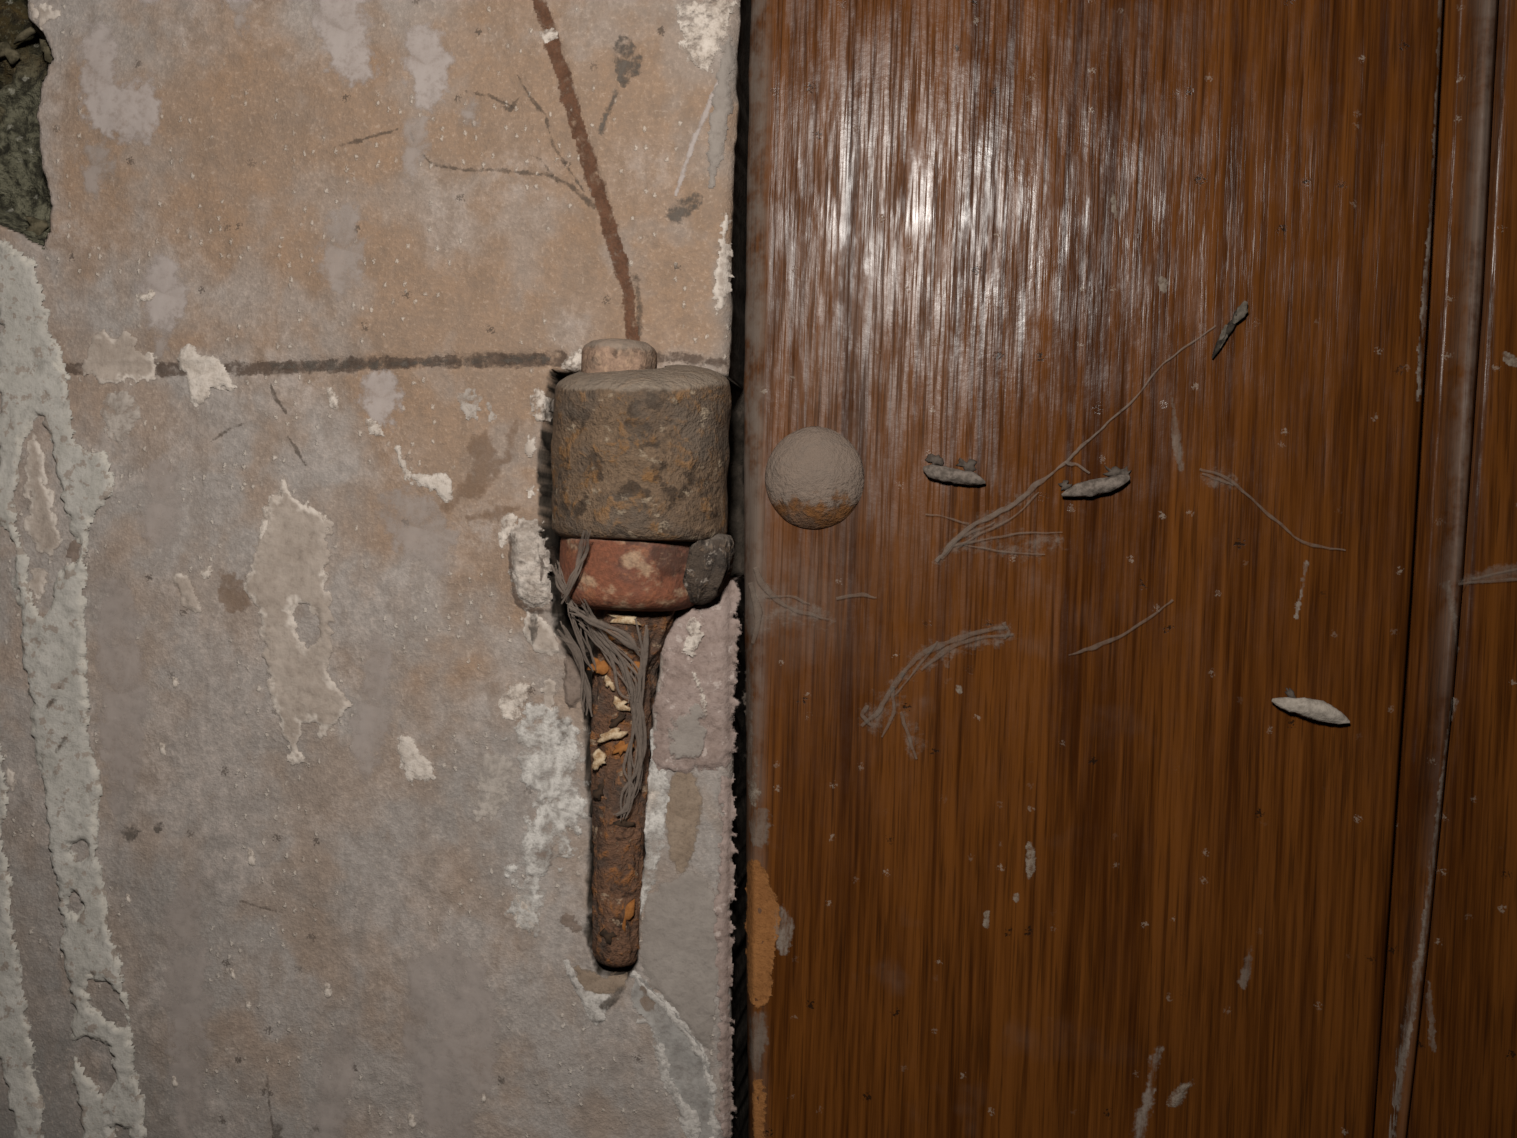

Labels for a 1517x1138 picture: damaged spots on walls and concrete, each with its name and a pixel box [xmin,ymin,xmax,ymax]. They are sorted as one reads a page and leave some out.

spalling [0,0,61,249]
leakage [138,255,188,356]
crack [65,363,83,375]
crack [156,362,186,378]
crack [224,351,567,412]
leakage [23,433,61,605]
leakage [475,703,591,936]